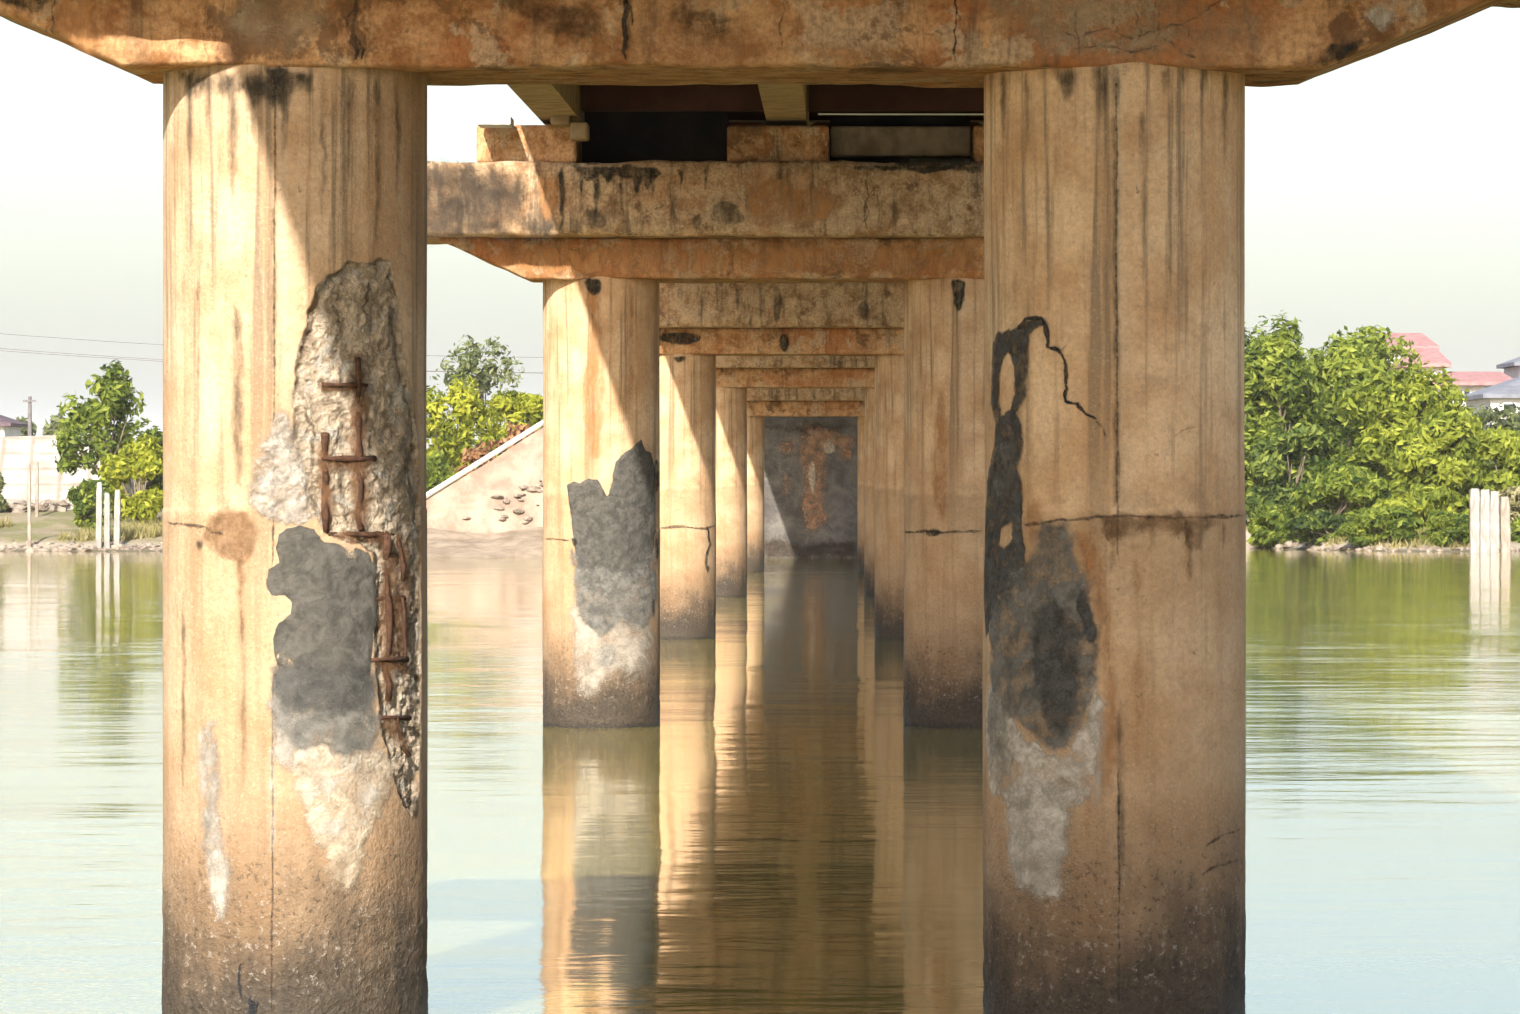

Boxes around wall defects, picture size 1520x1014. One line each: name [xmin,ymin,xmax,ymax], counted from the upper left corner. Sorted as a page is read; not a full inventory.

water stain [181,71,311,133]
water stain [1060,71,1073,93]
water stain [1318,40,1361,64]
crack [1017,316,1106,436]
corrosion [781,424,854,531]
spalling [248,260,422,889]
corrosion [317,354,410,702]
crack [662,525,714,572]
crack [905,528,978,536]
crack [1025,514,1240,541]
peeling [570,530,659,695]